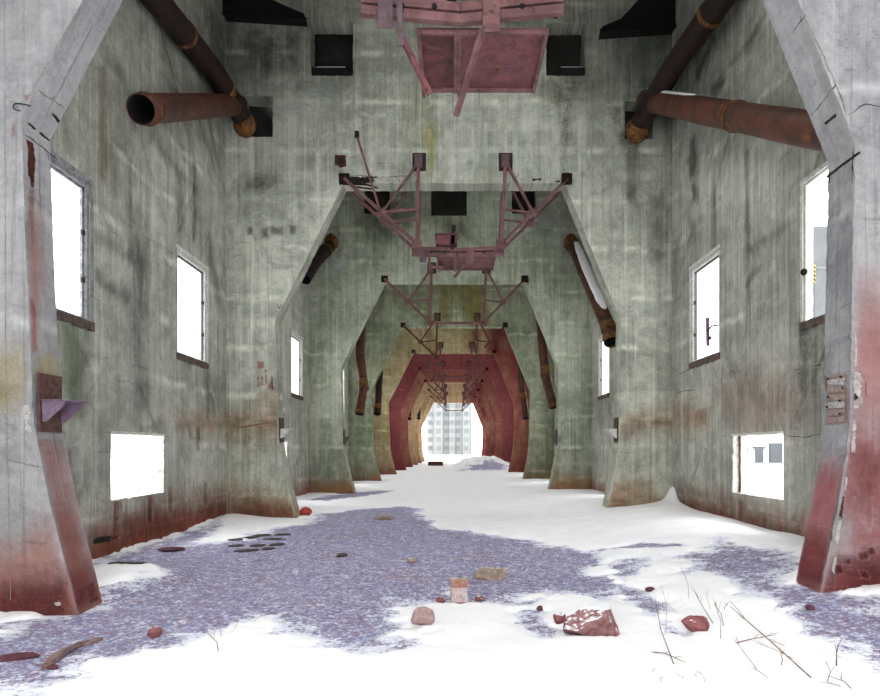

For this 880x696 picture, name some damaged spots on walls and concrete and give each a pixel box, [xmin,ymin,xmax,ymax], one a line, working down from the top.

crack [794,3,880,117]
spalling [26,139,36,188]
spalling [824,332,867,453]
corrosion [92,498,219,559]
spalling [835,477,848,545]